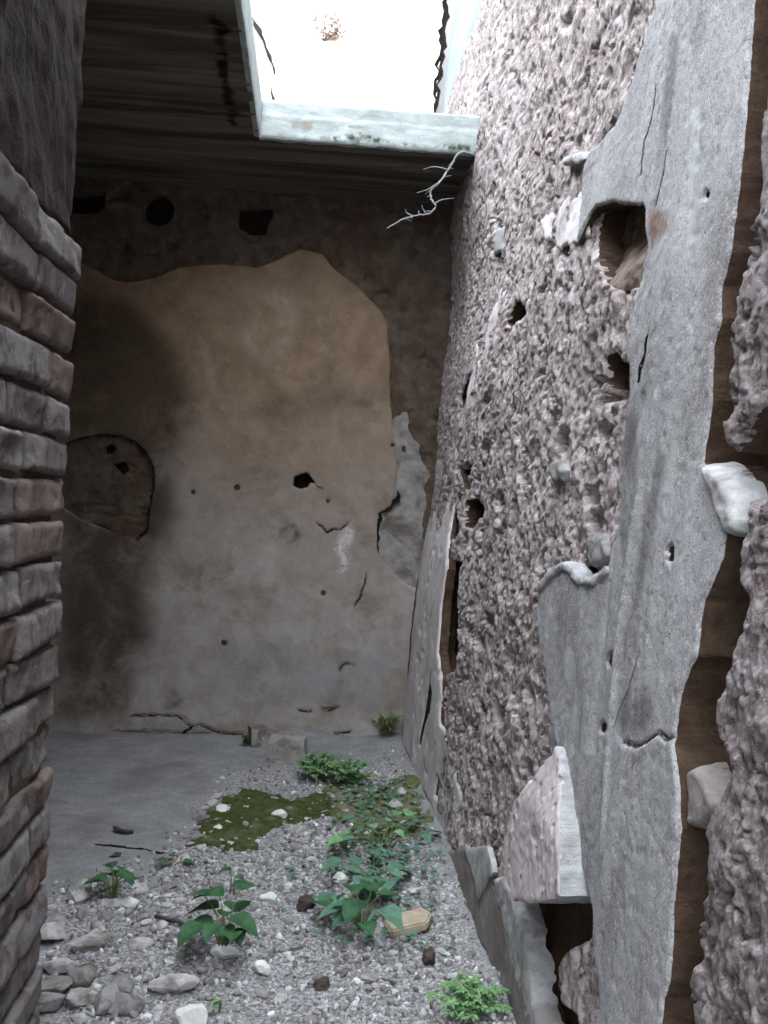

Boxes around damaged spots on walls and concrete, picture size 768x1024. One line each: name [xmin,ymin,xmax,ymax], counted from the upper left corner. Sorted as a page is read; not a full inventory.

damp [211,17,239,126]
crack [640,85,667,205]
crack [637,335,648,383]
spalling [54,434,155,539]
spalling [70,0,659,900]
crack [355,574,366,606]
crack [112,712,244,735]
crack [613,650,673,747]
spalling [552,931,600,1024]